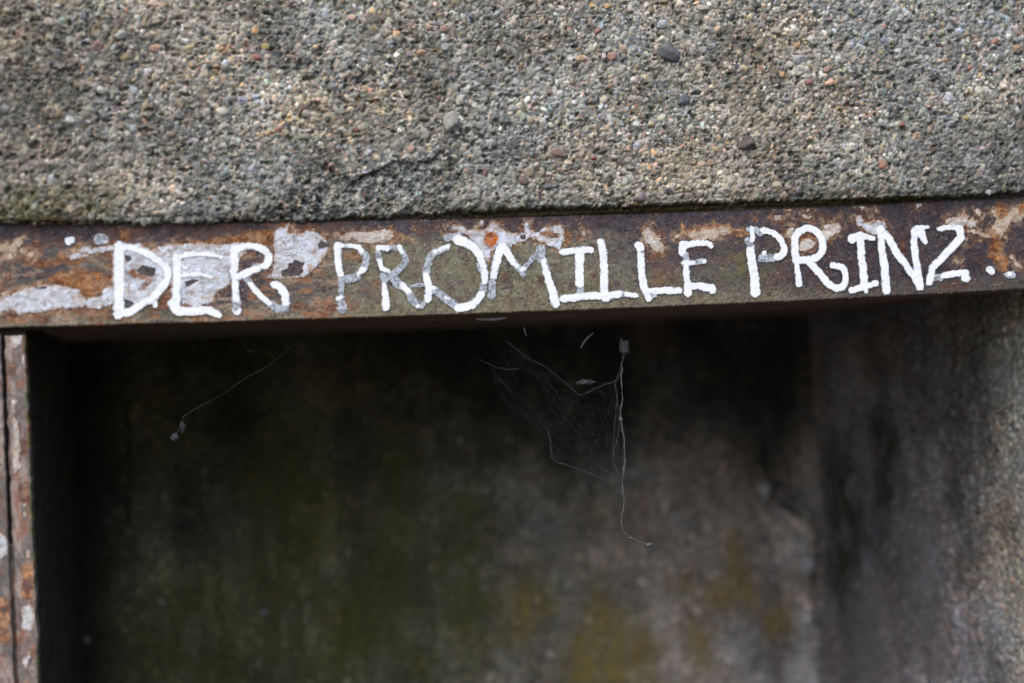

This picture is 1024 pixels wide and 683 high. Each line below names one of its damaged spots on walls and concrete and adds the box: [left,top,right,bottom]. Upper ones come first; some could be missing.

corrosion [172,230,274,248]
corrosion [484,231,498,249]
corrosion [681,221,749,237]
corrosion [989,203,1024,272]
corrosion [35,237,111,321]
corrosion [128,269,155,290]
corrosion [146,293,172,318]
corrosion [21,564,34,599]
corrosion [0,597,10,645]